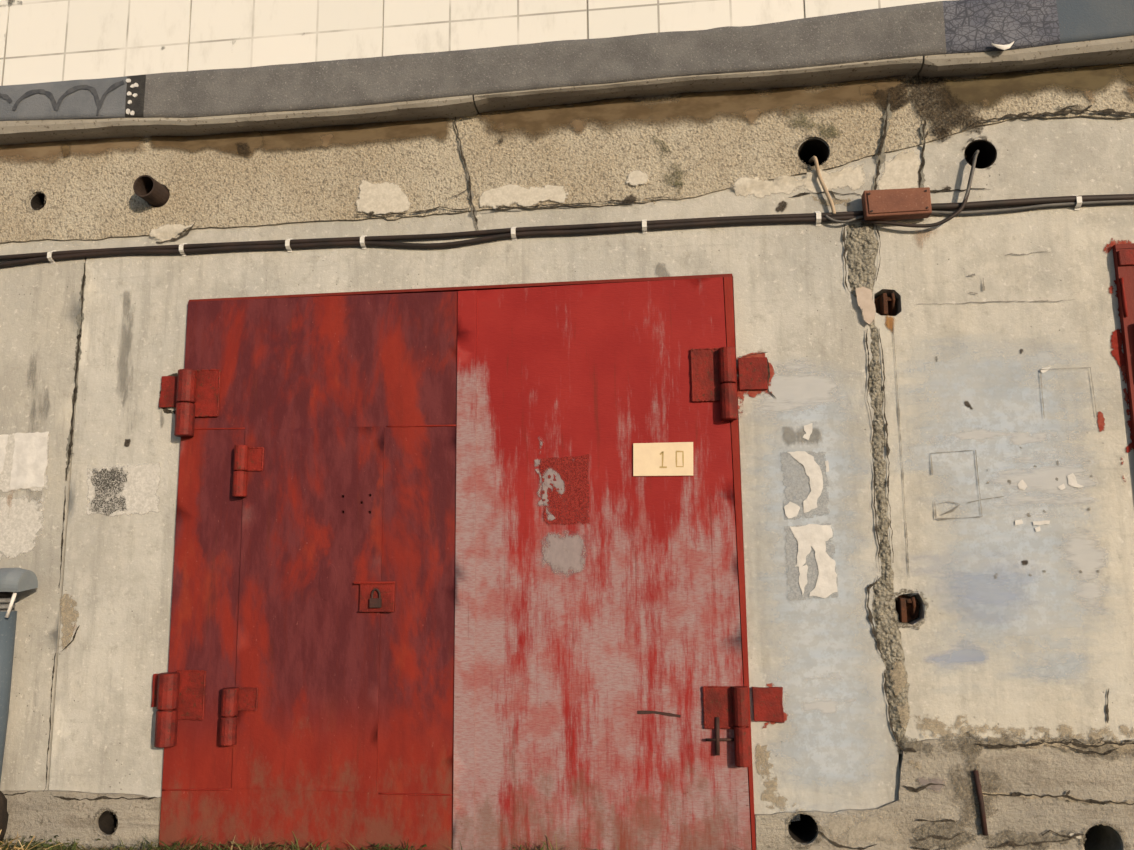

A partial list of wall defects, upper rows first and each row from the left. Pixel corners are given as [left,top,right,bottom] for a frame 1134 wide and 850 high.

peeling [355,179,411,216]
peeling [479,184,569,210]
crack [410,117,678,231]
damp [479,62,1134,142]
crack [788,92,892,201]
crack [918,118,985,193]
crack [963,104,1134,129]
crack [893,326,909,573]
spalling [786,661,1133,850]
crack [960,689,1134,805]
crack [816,830,877,850]
crack [903,783,955,850]